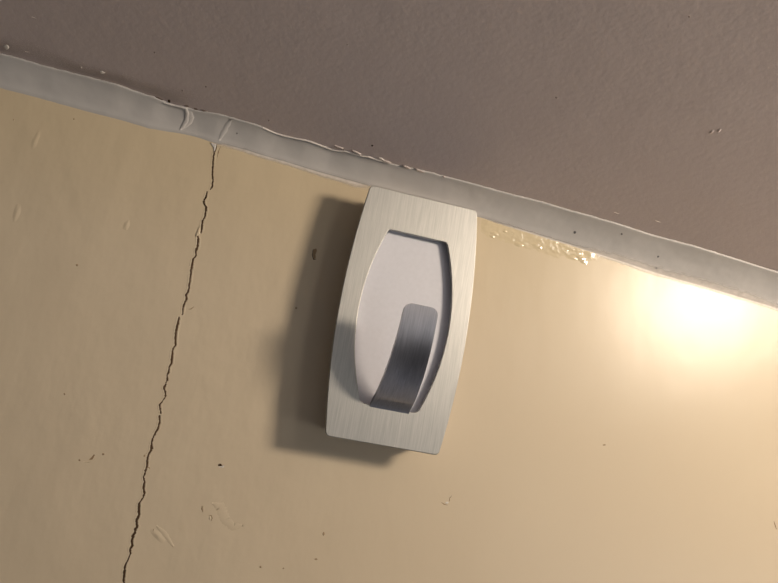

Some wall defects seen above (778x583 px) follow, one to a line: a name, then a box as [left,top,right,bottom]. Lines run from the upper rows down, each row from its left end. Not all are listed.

crack [121,143,221,583]